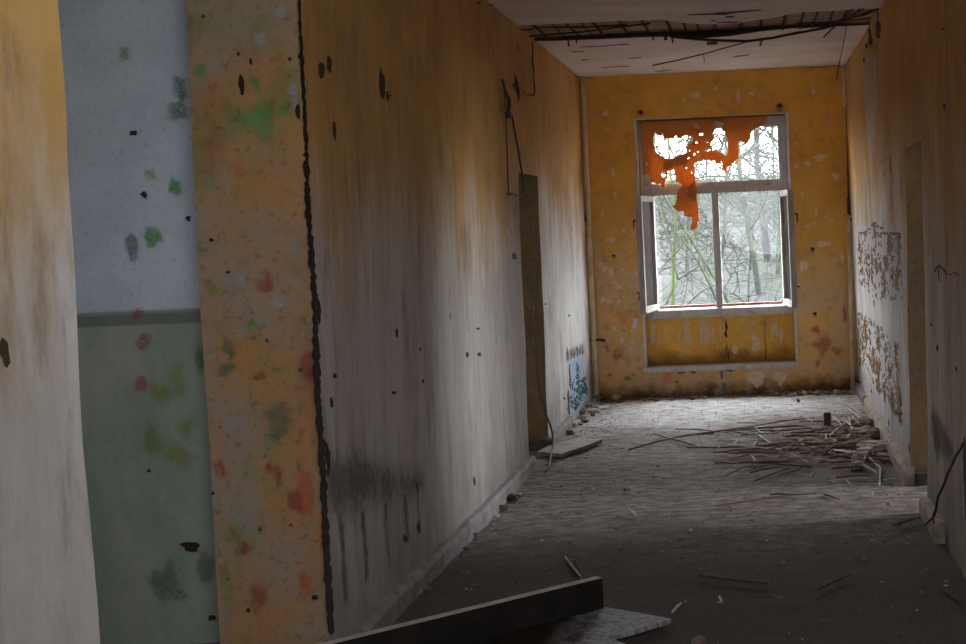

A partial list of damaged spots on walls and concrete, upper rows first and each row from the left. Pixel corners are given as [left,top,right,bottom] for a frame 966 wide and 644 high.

spalling [830,122,851,215]
peeling [840,219,909,426]